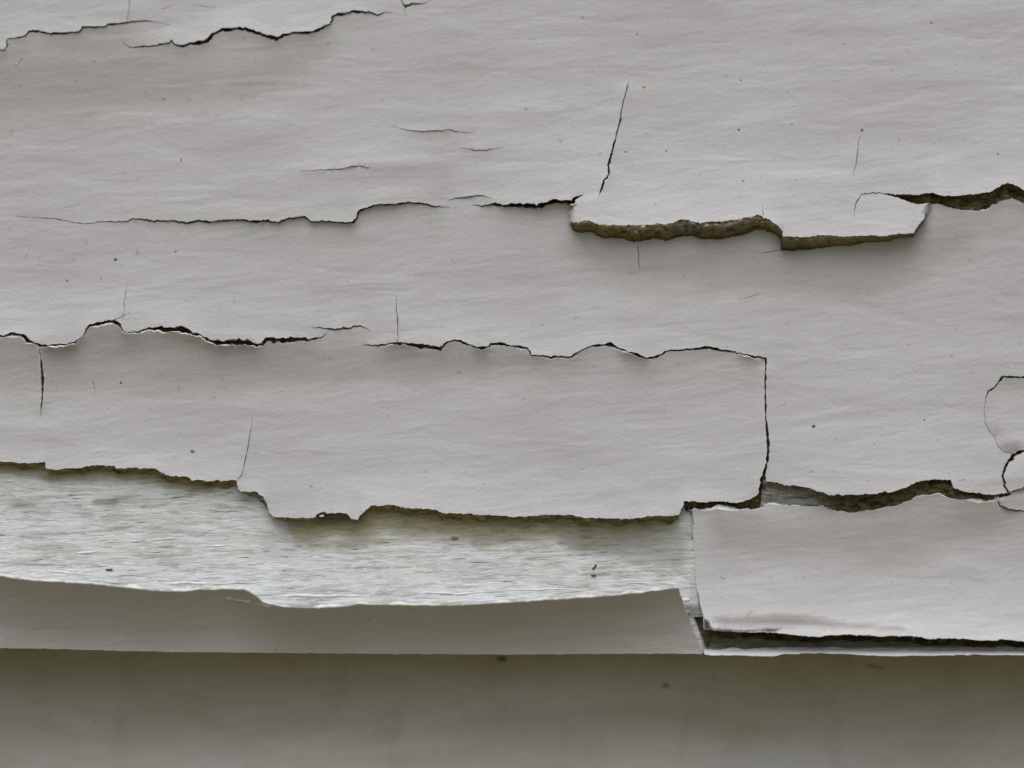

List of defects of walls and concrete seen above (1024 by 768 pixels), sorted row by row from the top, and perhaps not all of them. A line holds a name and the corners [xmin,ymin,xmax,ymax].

crack [0,0,430,63]
crack [16,81,629,224]
peeling [570,78,930,251]
crack [0,293,1024,513]
peeling [0,323,1024,656]